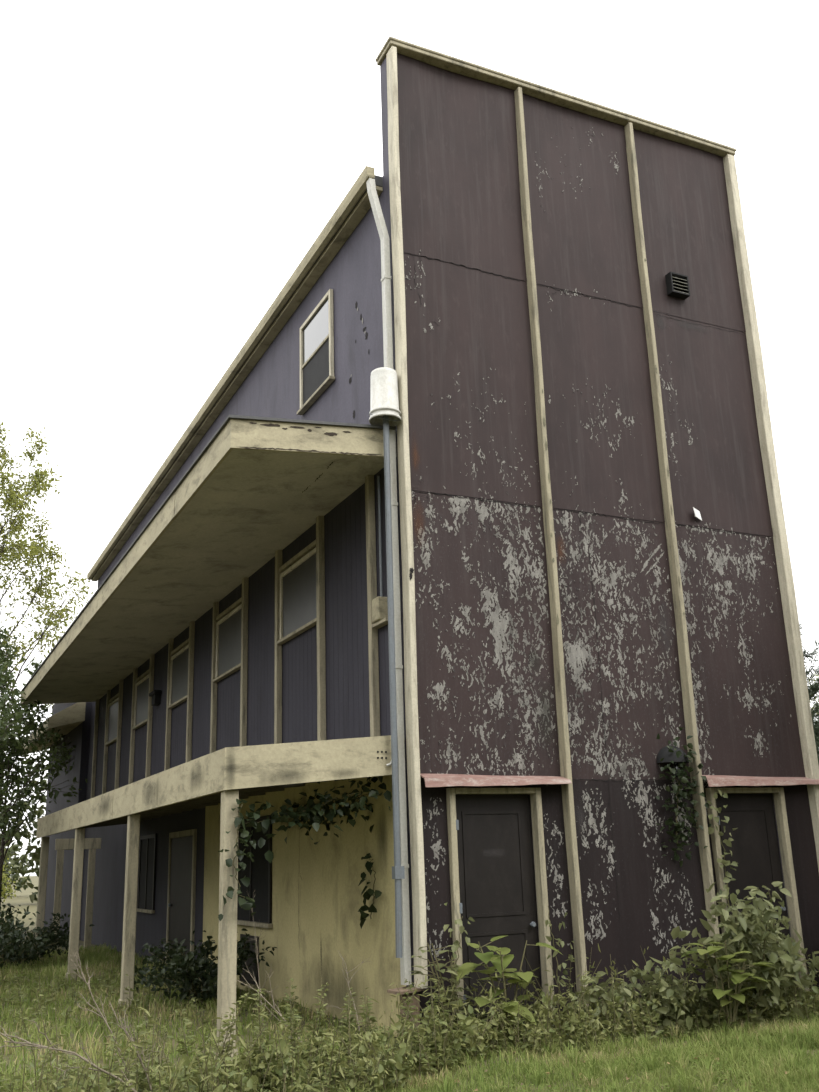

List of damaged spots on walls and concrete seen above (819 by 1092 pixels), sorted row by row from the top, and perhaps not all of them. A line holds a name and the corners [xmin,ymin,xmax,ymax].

peeling [409,362,791,958]